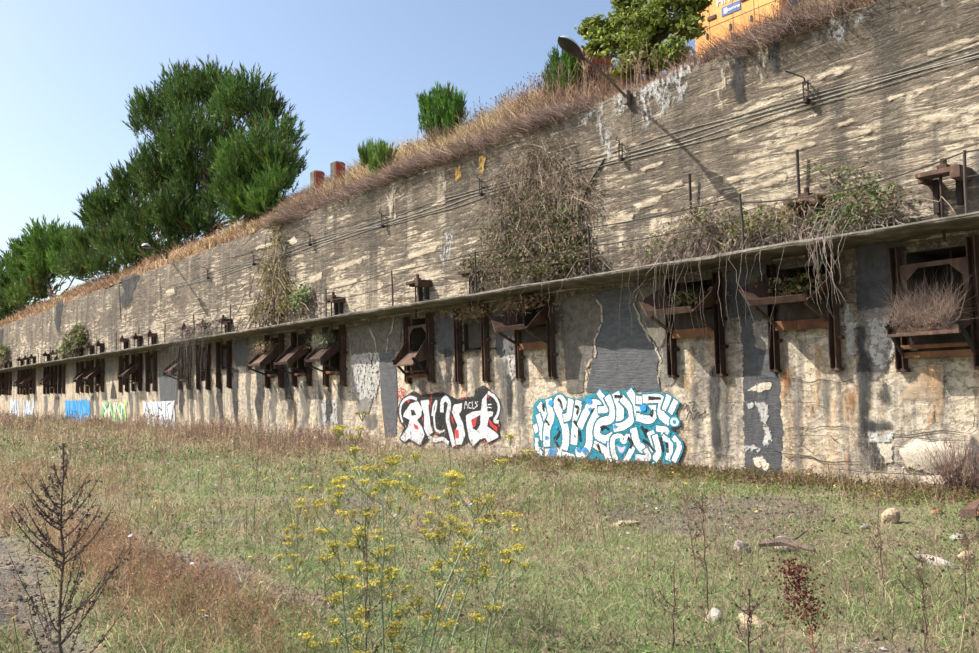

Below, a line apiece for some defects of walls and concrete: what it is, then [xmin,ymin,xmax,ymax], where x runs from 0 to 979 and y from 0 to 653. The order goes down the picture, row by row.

peeling [727,259,784,476]
damp [856,326,891,469]